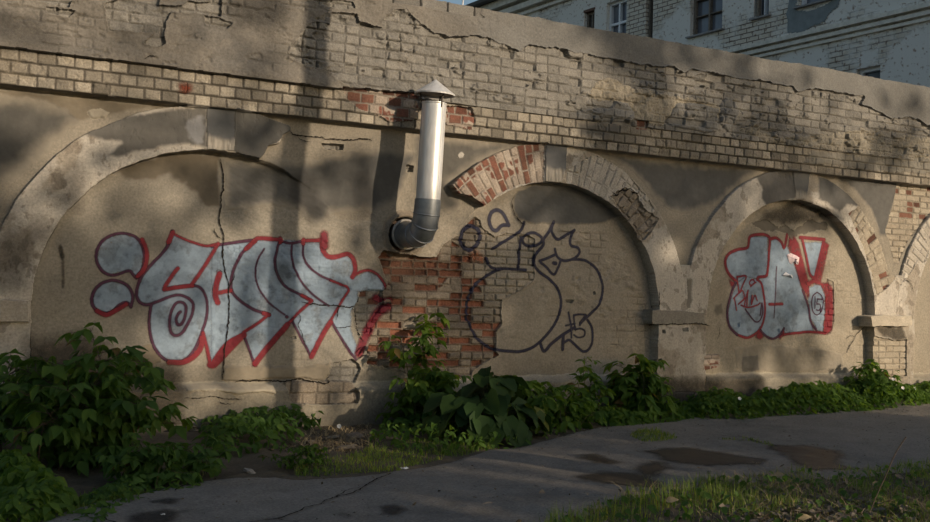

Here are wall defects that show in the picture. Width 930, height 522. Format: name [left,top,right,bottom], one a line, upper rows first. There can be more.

spalling [36,0,75,17]
spalling [104,0,233,47]
spalling [288,0,930,158]
crack [186,159,330,405]
crack [290,131,372,142]
spalling [181,217,535,404]
spalling [452,142,549,206]
spalling [566,155,659,241]
spalling [848,183,930,295]